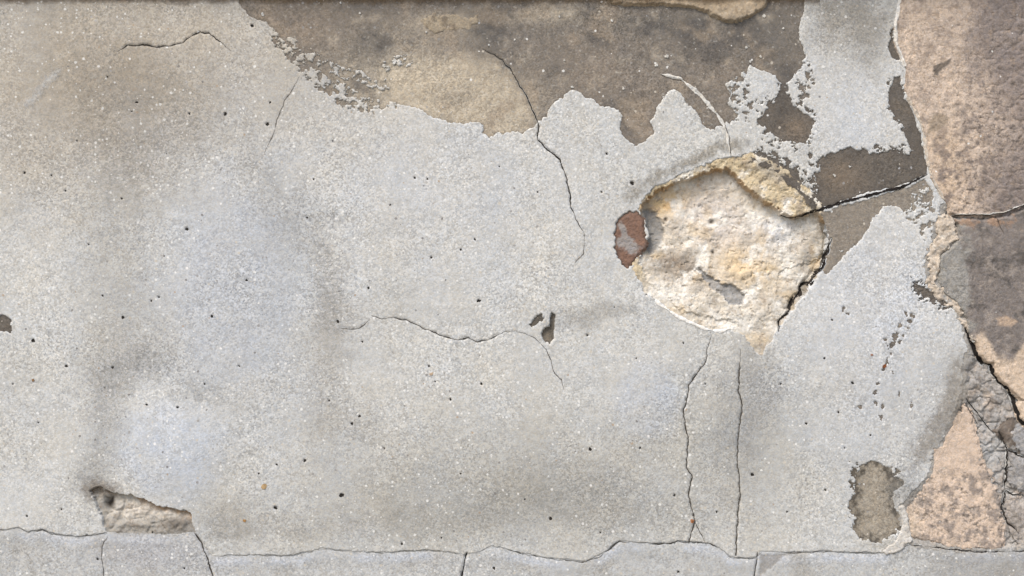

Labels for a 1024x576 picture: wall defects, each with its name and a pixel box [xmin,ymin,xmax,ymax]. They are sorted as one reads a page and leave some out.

crack [119,32,227,51]
crack [483,49,585,262]
crack [780,174,927,219]
peeling [239,0,1024,555]
crack [778,239,832,332]
crack [343,315,564,390]
crack [195,338,758,576]
spalling [92,487,196,535]